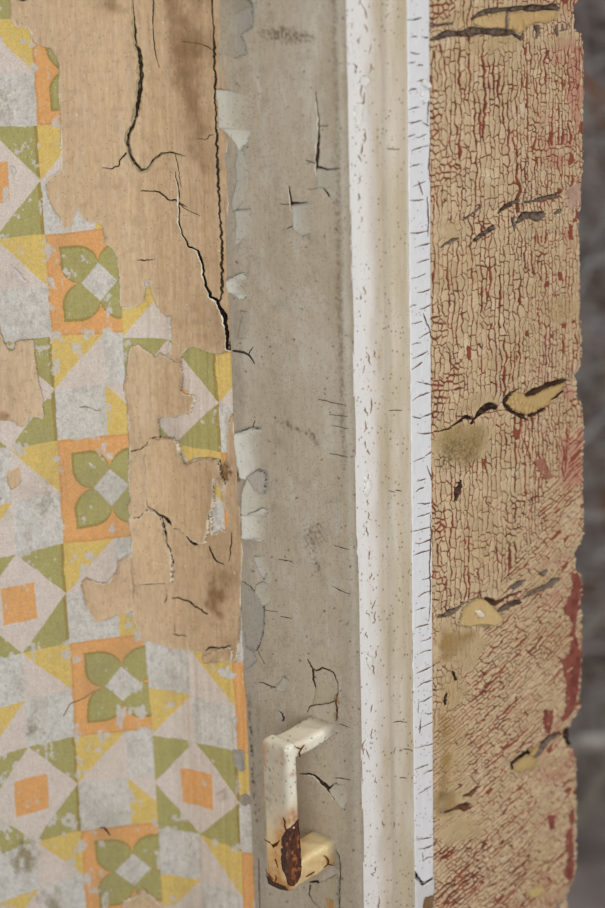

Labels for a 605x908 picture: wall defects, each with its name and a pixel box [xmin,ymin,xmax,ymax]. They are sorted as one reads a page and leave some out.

peeling [473,9,570,34]
crack [283,0,372,229]
crack [106,0,255,364]
peeling [0,330,44,427]
peeling [10,0,270,677]
crack [318,18,433,794]
peeling [506,382,565,415]
crack [134,500,232,614]
peeling [458,598,504,627]
crack [307,659,347,727]
peeling [513,572,583,772]
crack [295,745,349,810]